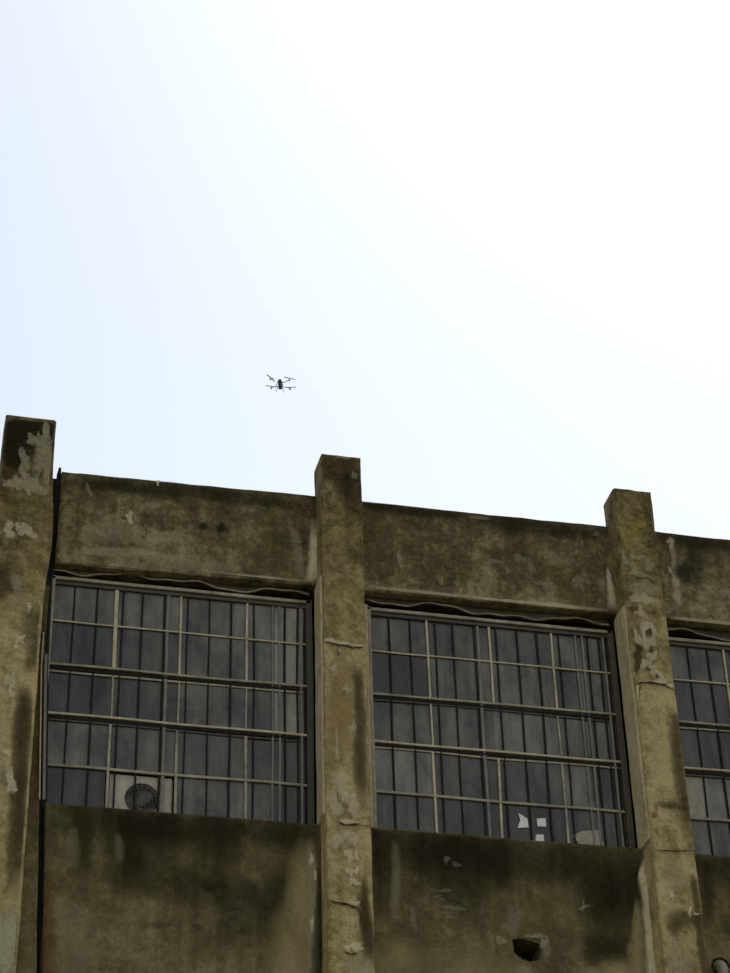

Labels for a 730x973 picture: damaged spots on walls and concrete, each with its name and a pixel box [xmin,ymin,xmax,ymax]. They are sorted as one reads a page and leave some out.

peeling [3,422,52,496]
peeling [3,522,37,538]
flaking render [633,644,660,677]
leakage [10,692,31,871]
leakage [273,852,317,973]
leakage [360,884,415,973]
leakage [587,861,656,973]
leakage [692,881,709,973]